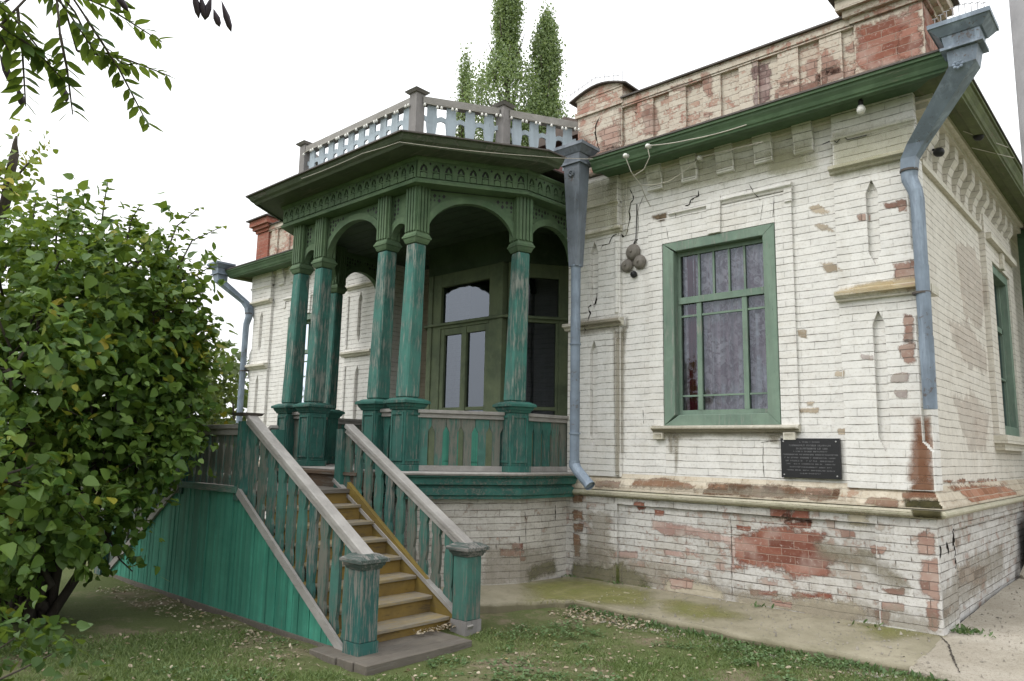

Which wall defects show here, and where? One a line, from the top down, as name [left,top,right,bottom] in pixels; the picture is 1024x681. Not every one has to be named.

flaking render [751,0,938,105]
crack [601,190,644,248]
flaking render [893,259,915,289]
flaking render [890,314,916,398]
flaking render [840,479,935,538]
flaking render [943,478,1017,502]
flaking render [500,543,526,561]
flaking render [595,478,905,625]
flaking render [917,531,940,631]
crack [940,529,960,586]